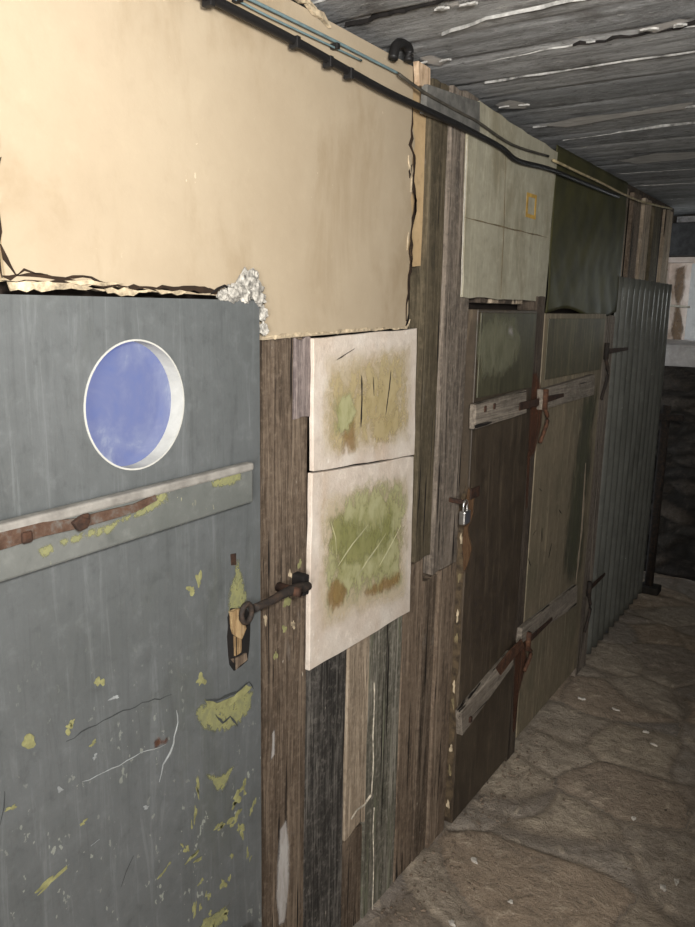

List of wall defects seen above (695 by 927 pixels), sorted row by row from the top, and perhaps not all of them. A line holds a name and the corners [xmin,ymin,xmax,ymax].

crack [406,108,417,321]
crack [0,219,105,283]
rust [526,374,542,507]
peeling [186,570,202,596]
peeling [196,682,254,732]
rust [512,641,527,732]
peeling [22,733,36,749]
peeling [191,768,232,829]
peeling [213,778,256,862]
peeling [35,866,68,896]
peeling [192,874,231,927]